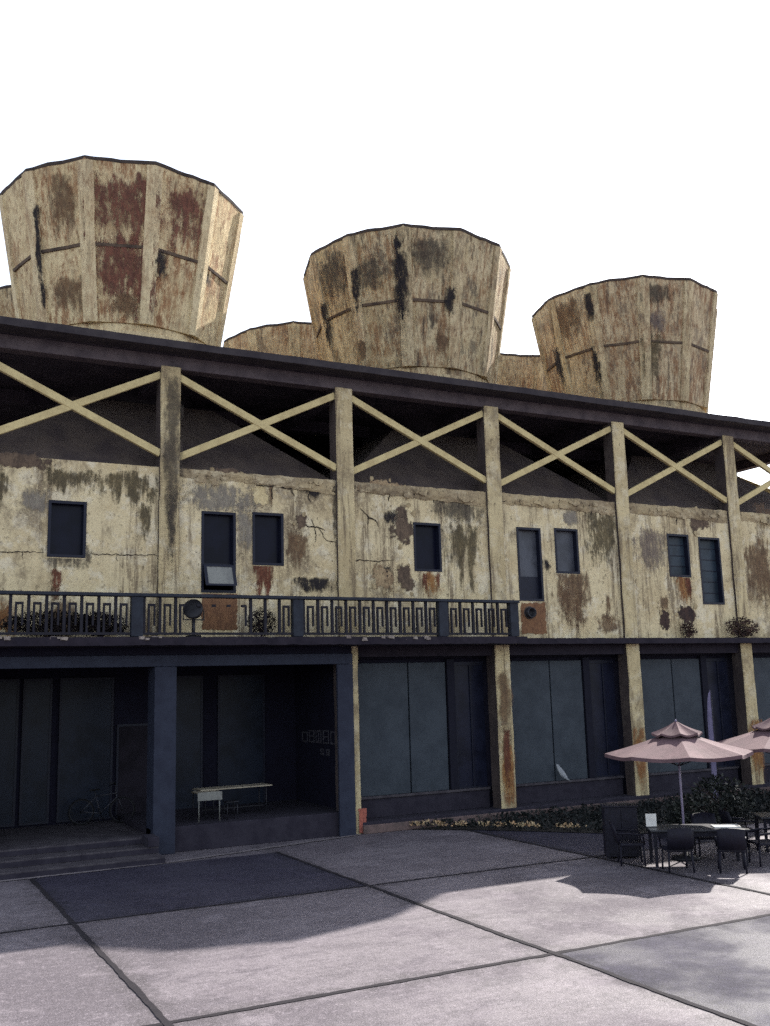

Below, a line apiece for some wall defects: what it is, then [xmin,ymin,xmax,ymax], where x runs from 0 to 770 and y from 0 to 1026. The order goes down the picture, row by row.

damp [33,204,46,308]
corrosion [48,172,207,323]
damp [320,234,449,347]
damp [584,292,594,321]
damp [21,378,184,555]
corrosion [253,566,273,595]
crack [256,485,434,542]
peeling [357,476,407,493]
peeling [389,502,416,549]
damp [434,500,482,591]
damp [542,510,617,632]
corrosion [497,671,516,805]